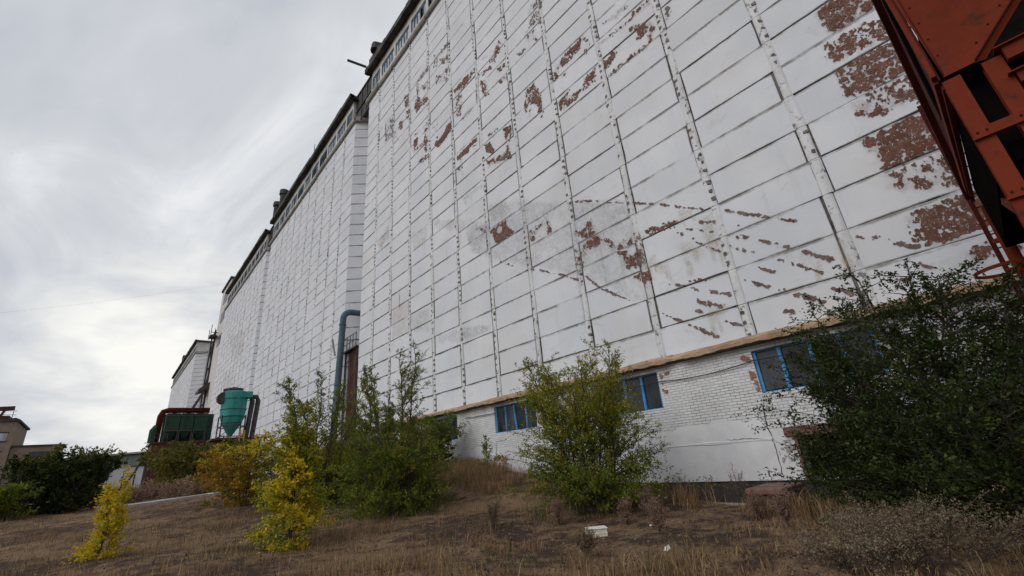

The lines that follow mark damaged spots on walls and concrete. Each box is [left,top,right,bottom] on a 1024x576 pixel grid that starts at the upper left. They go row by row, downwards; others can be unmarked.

peeling [385,40,507,162]
peeling [457,125,512,170]
peeling [523,83,544,118]
peeling [552,0,655,111]
peeling [817,0,996,269]
peeling [476,220,514,243]
peeling [532,200,854,315]
peeling [657,311,719,338]